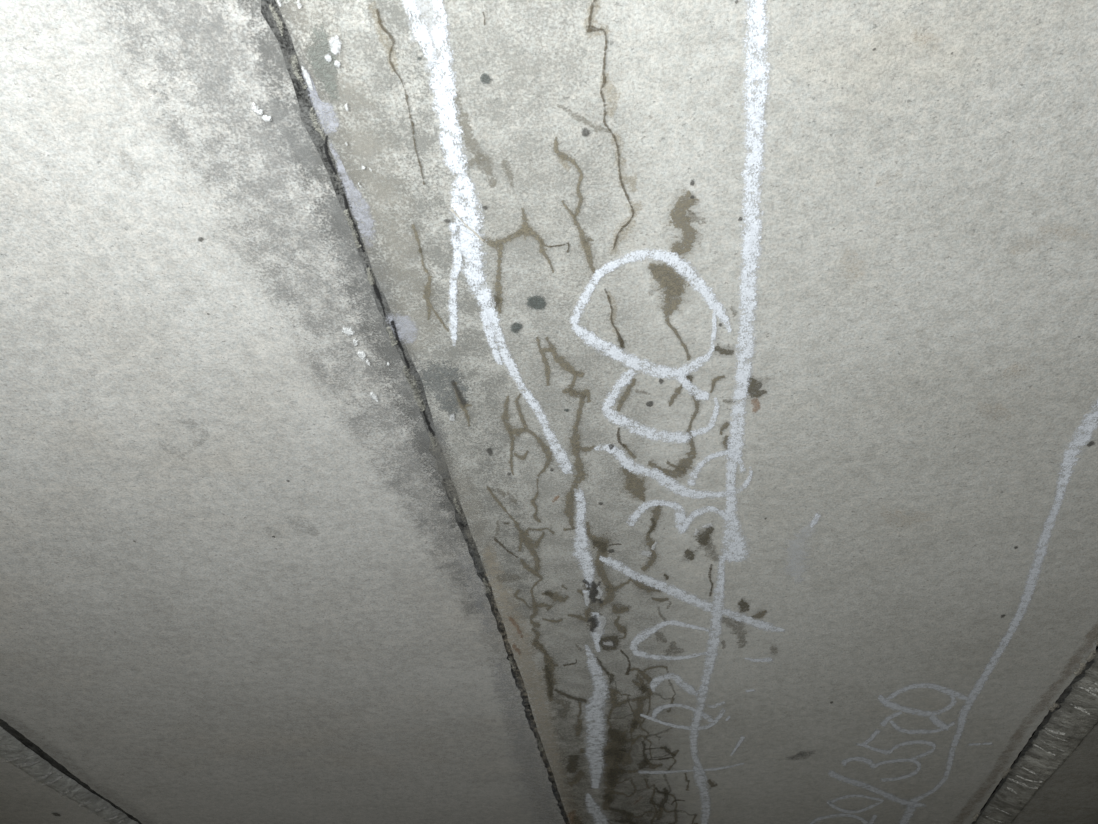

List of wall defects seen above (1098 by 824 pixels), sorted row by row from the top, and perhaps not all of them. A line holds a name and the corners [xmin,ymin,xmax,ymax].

crack [376,9,425,185]
crack [450,0,634,349]
water stain [246,0,461,526]
water stain [648,191,700,360]
crack [454,382,472,427]
water stain [720,422,731,450]
water stain [746,376,767,411]
water stain [622,465,647,502]
crack [487,337,725,824]
water stain [684,523,717,597]
water stain [720,600,767,648]
water stain [601,728,633,810]